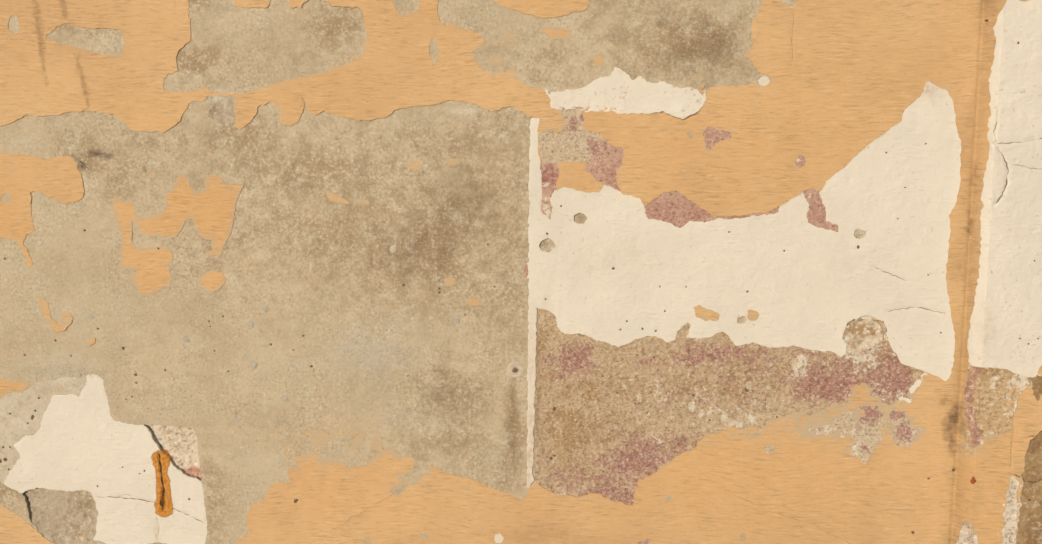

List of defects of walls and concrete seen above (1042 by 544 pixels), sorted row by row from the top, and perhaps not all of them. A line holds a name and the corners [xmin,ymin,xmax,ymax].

peeling [164,0,367,94]
peeling [437,0,961,505]
peeling [964,0,1042,456]
peeling [0,95,533,544]
corrosion [151,450,173,517]
spalling [956,520,978,544]
spalling [998,430,1042,544]